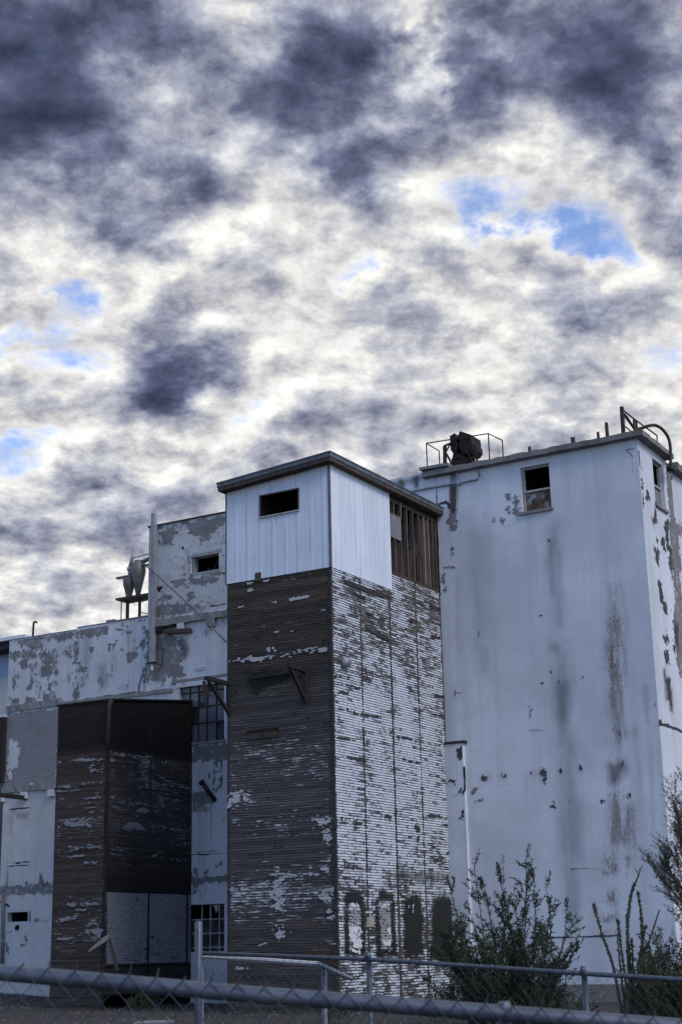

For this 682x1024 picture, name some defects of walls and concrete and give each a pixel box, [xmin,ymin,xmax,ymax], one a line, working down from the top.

peeling [157,515,225,546]
peeling [492,492,521,524]
flaking render [156,572,225,619]
peeling [641,471,682,709]
flaking render [4,626,200,794]
peeling [446,775,488,802]
peeling [347,902,363,954]
peeling [377,899,393,952]